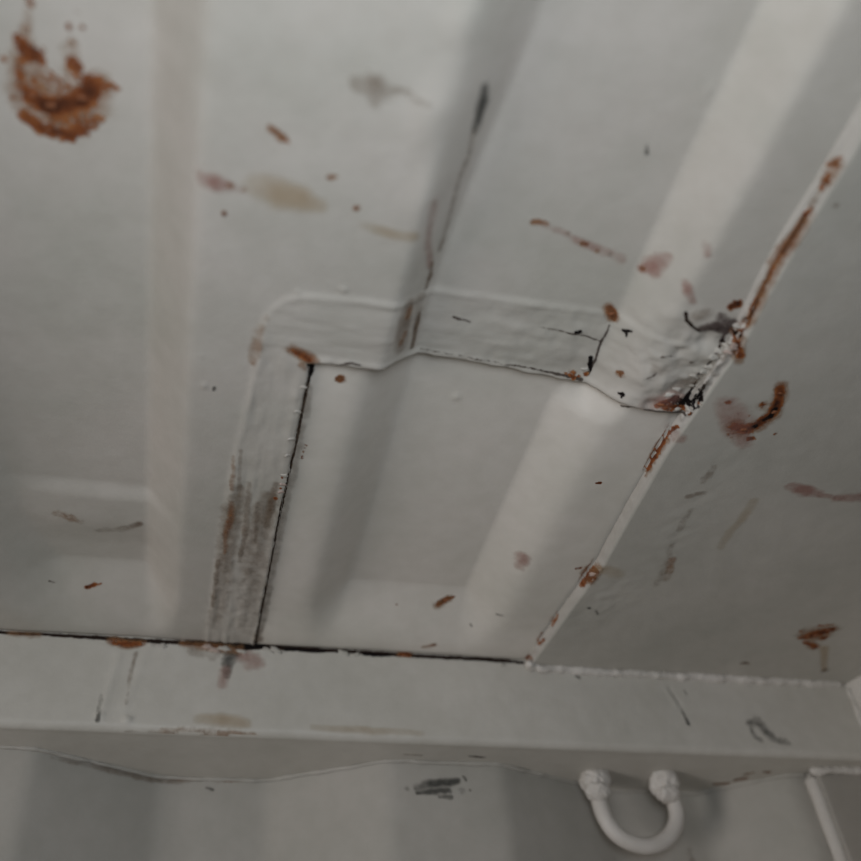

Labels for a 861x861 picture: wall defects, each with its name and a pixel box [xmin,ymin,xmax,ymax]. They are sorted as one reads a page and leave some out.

corrosion [0,27,121,143]
corrosion [819,156,843,192]
peeling [684,300,743,356]
corrosion [732,322,748,359]
corrosion [288,347,316,377]
crack [620,405,687,416]
peeling [664,387,690,412]
corrosion [727,382,786,441]
corrosion [644,425,680,473]
crack [0,370,525,667]
corrosion [575,564,601,587]
corrosion [798,624,837,650]